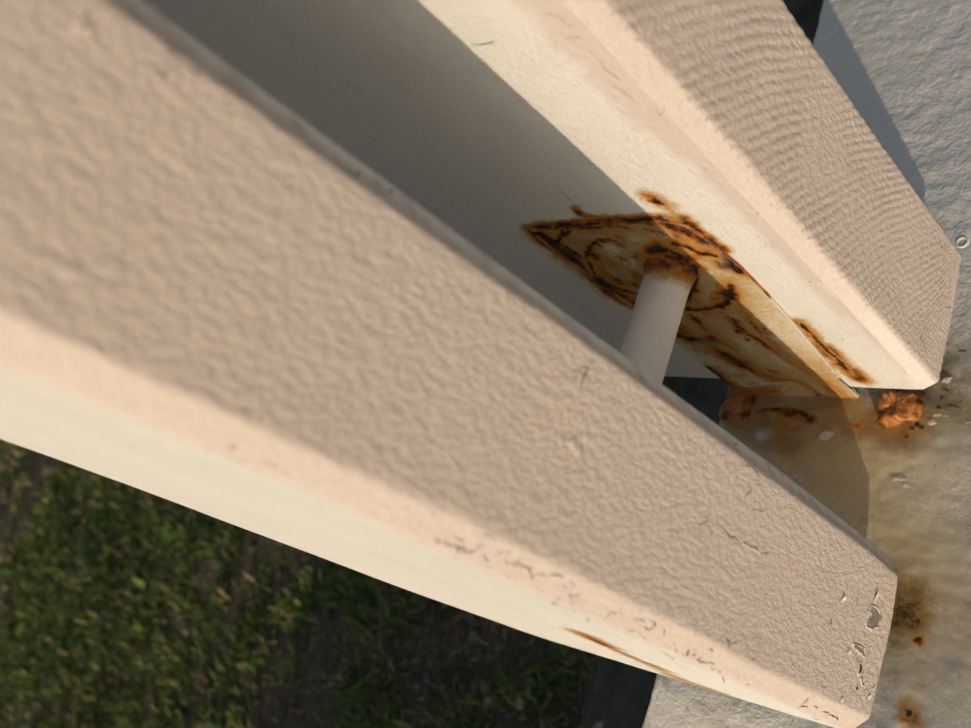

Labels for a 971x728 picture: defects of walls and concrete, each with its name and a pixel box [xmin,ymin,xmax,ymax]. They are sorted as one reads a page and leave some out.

rust [522,191,874,421]
rust [876,389,926,428]
leakage [718,350,971,696]
peeling [843,594,883,700]
rust [888,571,932,647]
rust [897,699,924,728]